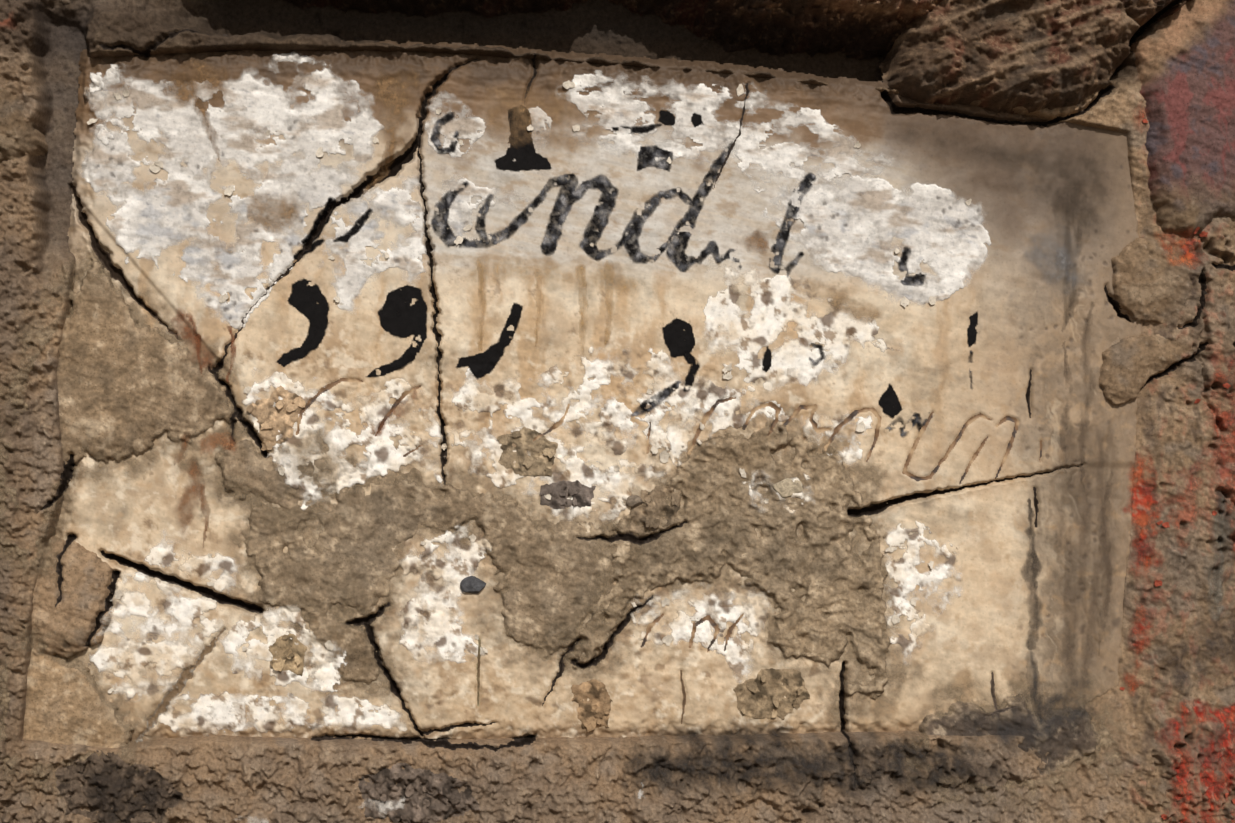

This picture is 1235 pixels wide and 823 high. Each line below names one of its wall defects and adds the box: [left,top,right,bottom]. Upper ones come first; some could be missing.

peeling [83,53,427,329]
crack [208,59,477,485]
peeling [563,70,991,307]
peeling [1164,227,1208,264]
crack [1025,369,1033,418]
crack [37,454,75,513]
crack [847,464,1083,527]
crack [55,534,264,743]
peeling [399,526,492,663]
spalling [571,679,613,732]
peeling [631,591,810,720]
crack [839,661,857,774]